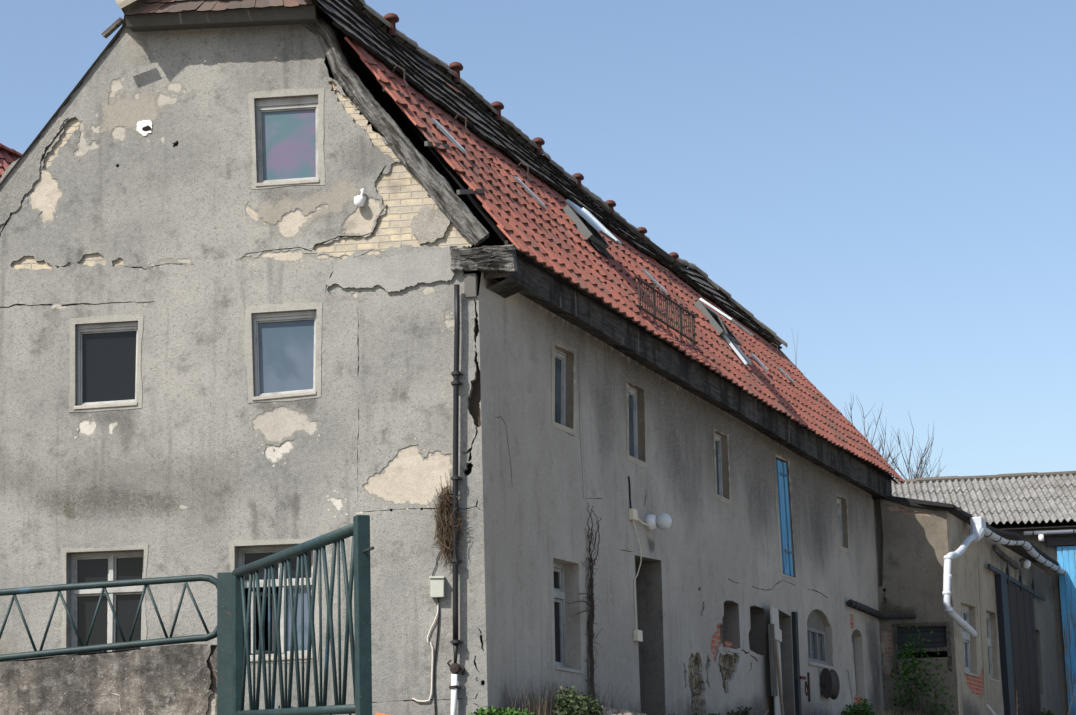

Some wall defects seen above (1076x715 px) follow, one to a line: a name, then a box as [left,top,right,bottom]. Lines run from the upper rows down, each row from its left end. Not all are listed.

flaking render [26,73,187,227]
flaking render [240,79,471,267]
flaking render [252,402,321,467]
flaking render [362,438,453,510]
crack [469,311,481,460]
flaking render [688,624,736,715]